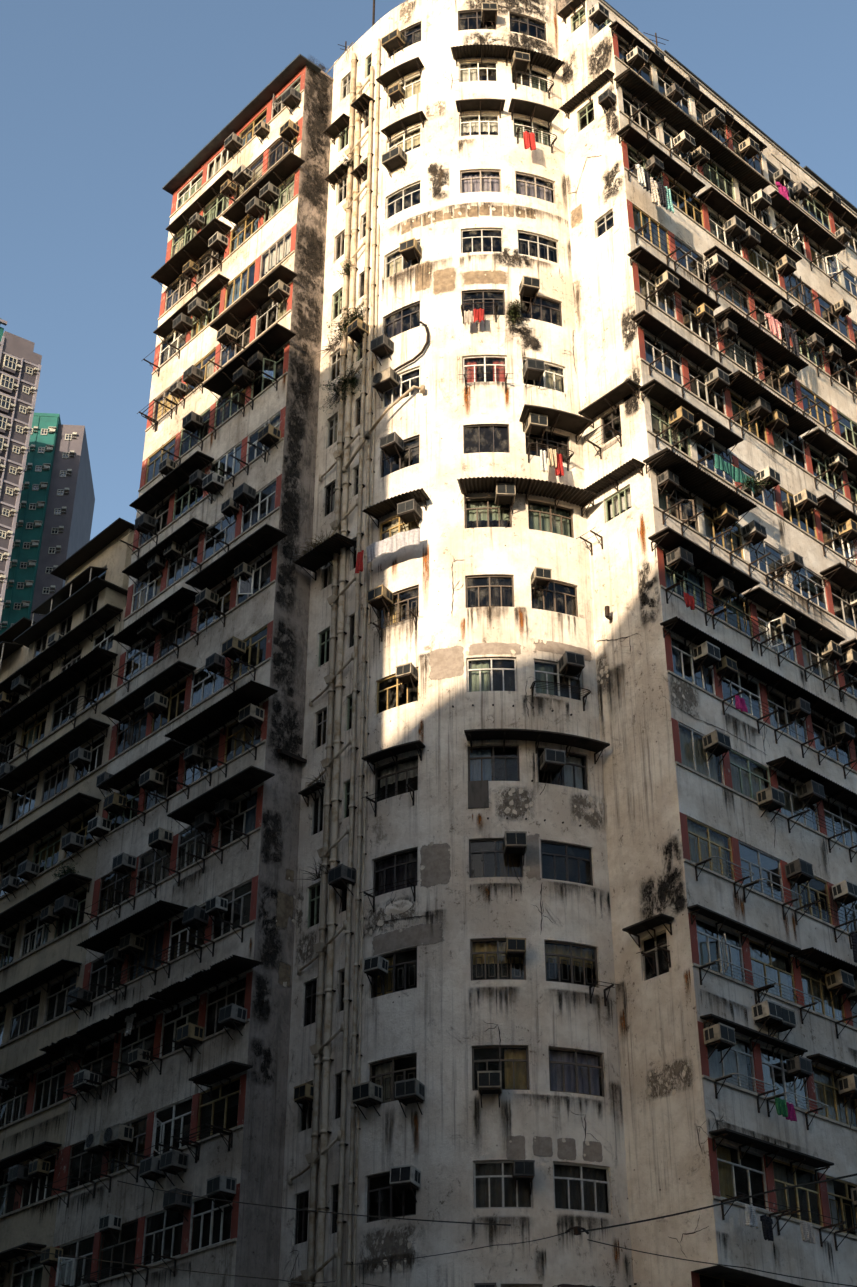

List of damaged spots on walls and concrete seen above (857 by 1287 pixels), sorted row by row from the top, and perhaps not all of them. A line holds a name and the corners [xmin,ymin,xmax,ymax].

leakage [455,0,547,21]
leakage [393,163,495,230]
leakage [485,301,541,356]
leakage [638,562,659,624]
spalling [429,638,609,692]
peeling [494,787,533,819]
peeling [572,794,605,829]
spalling [419,841,451,888]
leakage [641,837,685,919]
spalling [365,898,449,956]
leakage [469,987,516,1007]
peeling [645,1060,692,1098]